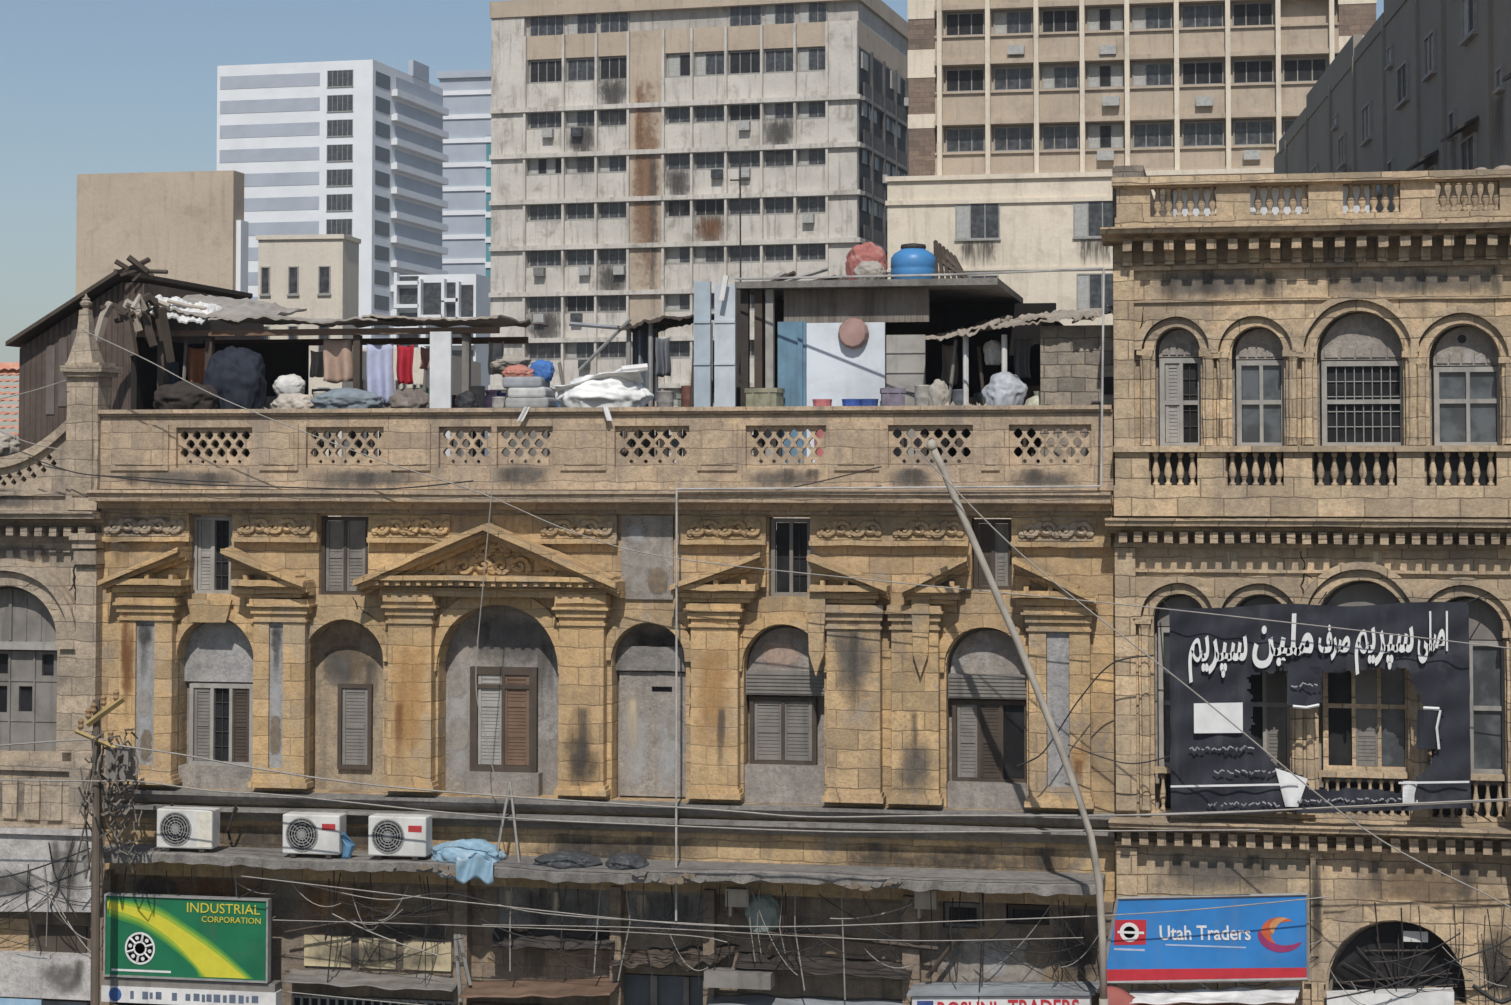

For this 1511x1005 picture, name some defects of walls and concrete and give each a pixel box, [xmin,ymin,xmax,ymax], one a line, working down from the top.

corrosion [635,90,656,267]
corrosion [123,616,132,689]
water stain [902,717,927,785]